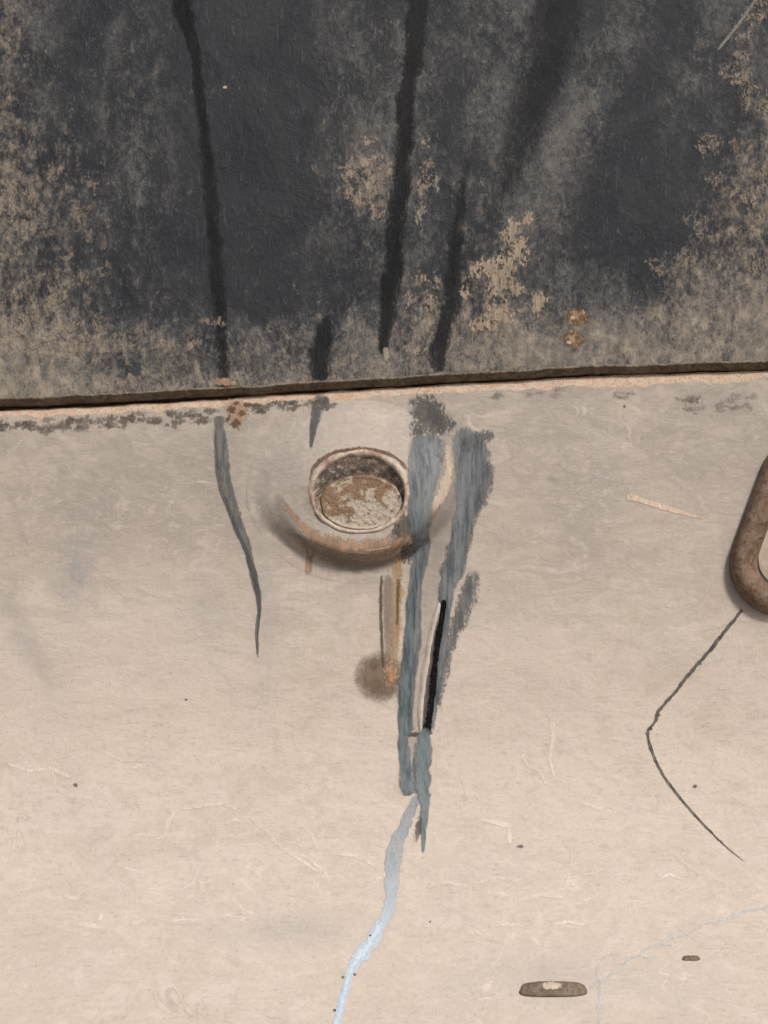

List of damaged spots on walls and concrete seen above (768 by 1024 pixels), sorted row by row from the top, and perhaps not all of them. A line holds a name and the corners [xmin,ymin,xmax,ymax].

damp [172,0,215,183]
damp [378,0,428,361]
damp [214,416,262,657]
damp [309,394,329,447]
damp [309,317,334,380]
rust [287,507,413,699]
rust [310,446,406,476]
damp [333,395,494,1024]
crack [417,600,446,736]
damp [429,202,466,372]
rust [563,308,589,350]
crack [646,609,743,860]